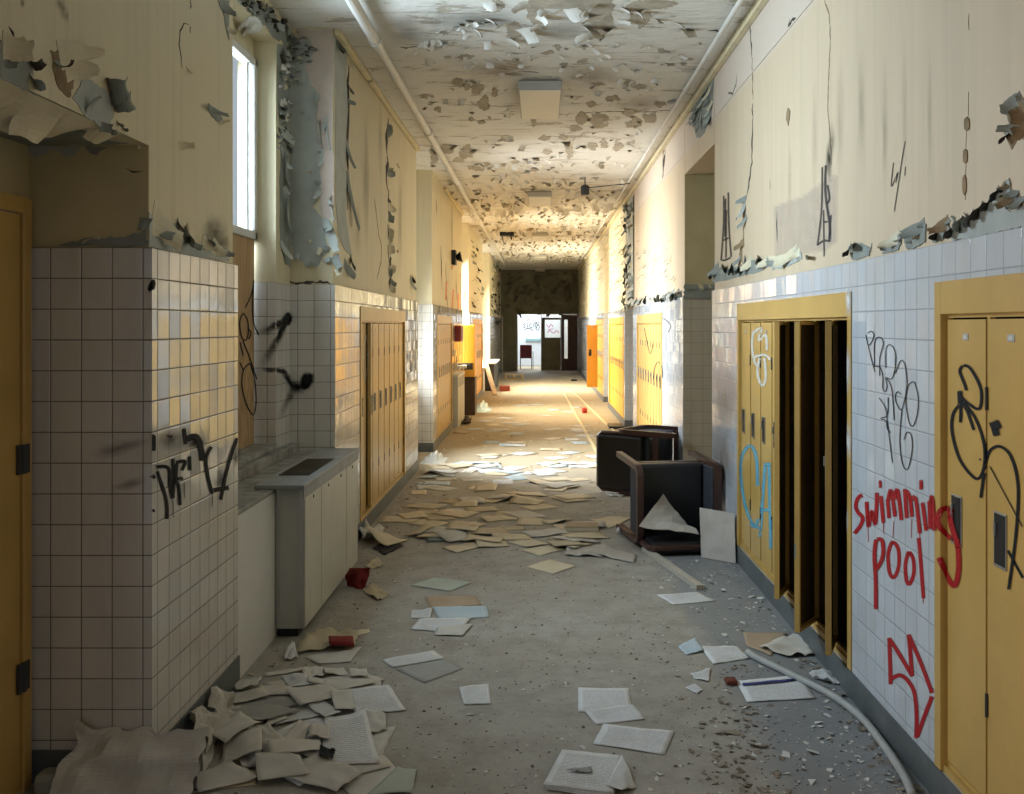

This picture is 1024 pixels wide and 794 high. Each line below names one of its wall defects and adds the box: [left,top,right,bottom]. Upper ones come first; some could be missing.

peeling [0,30,136,146]
peeling [59,200,235,261]
peeling [208,103,230,126]
peeling [217,0,360,285]
peeling [412,0,808,328]
crack [728,29,753,266]
crack [824,0,832,164]
peeling [842,178,1024,260]
peeling [996,91,1024,150]